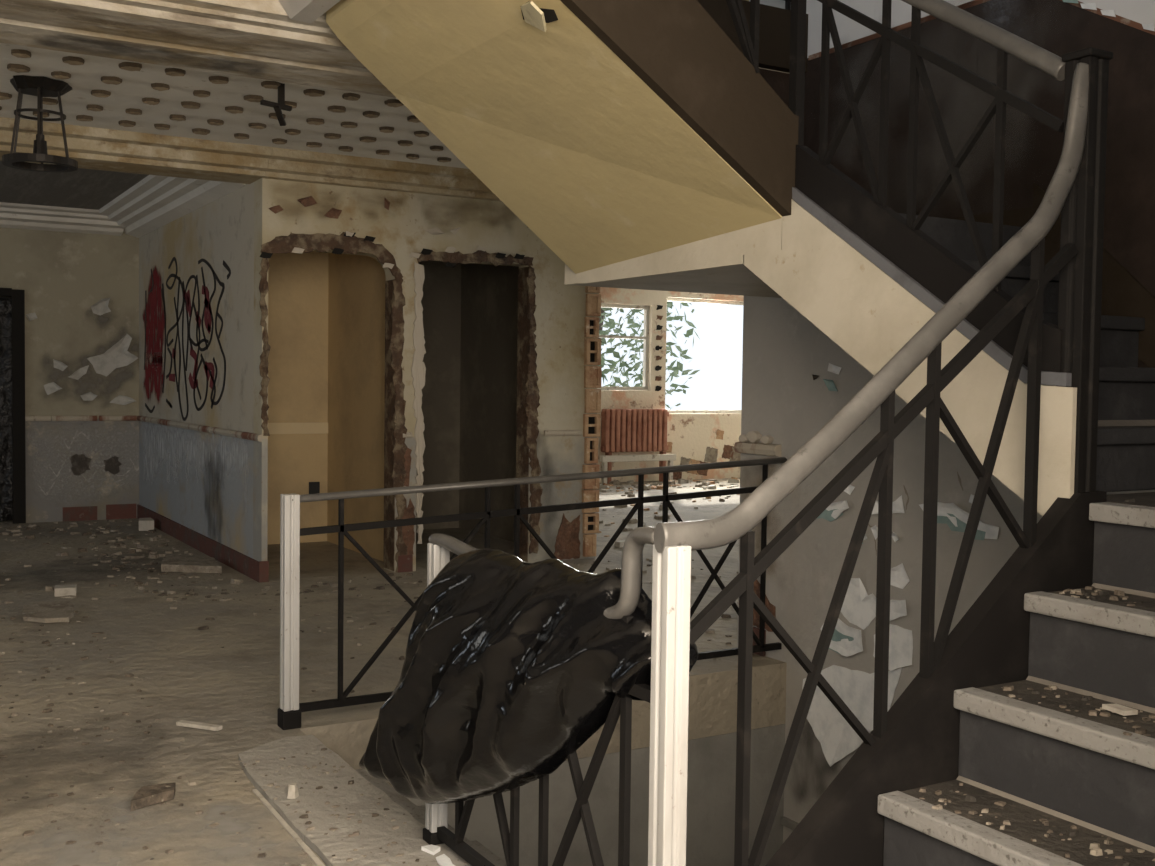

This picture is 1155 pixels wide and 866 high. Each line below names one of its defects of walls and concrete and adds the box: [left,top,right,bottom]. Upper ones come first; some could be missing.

spalling [298,196,342,219]
peeling [44,329,139,405]
spalling [259,227,602,573]
peeling [817,485,855,522]
peeling [862,501,878,556]
peeling [892,472,999,540]
peeling [802,563,913,767]